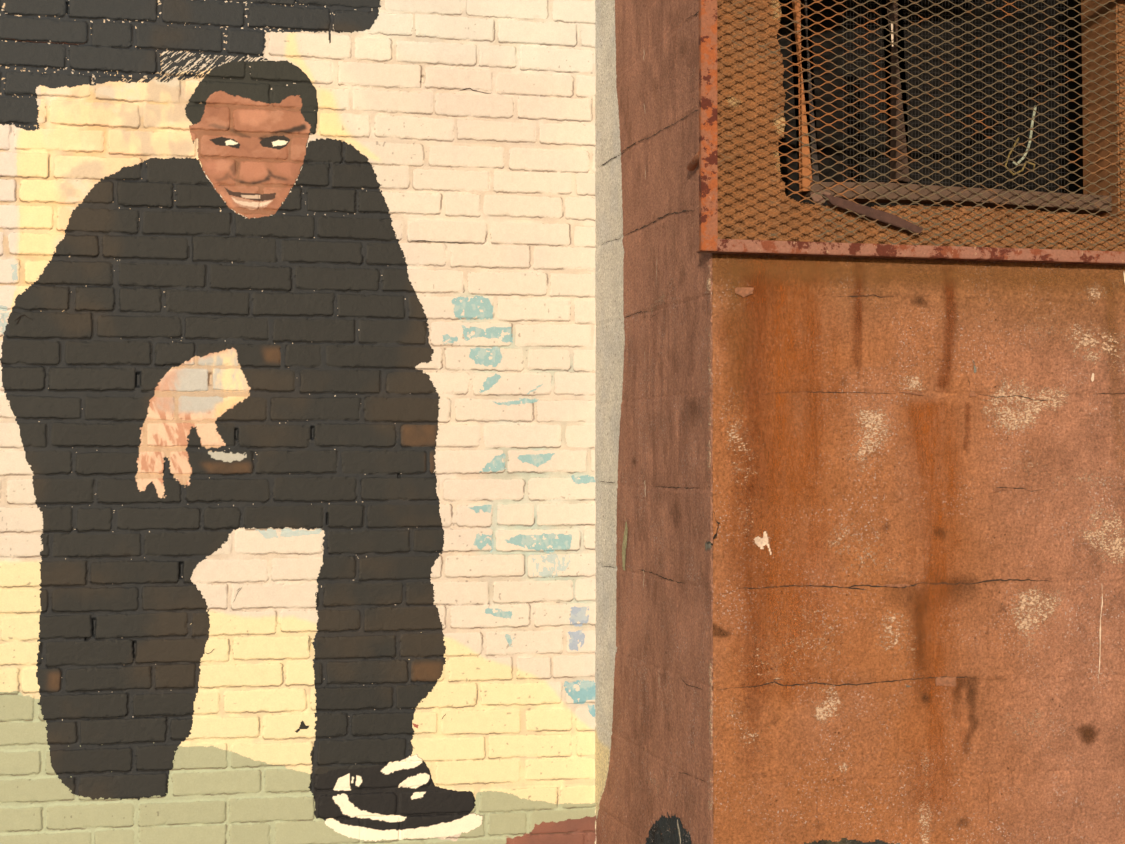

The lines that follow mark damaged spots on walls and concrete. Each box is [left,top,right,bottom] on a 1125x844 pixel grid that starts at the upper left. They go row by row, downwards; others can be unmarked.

crack [601,110,698,166]
crack [718,579,1048,595]
crack [683,676,979,690]